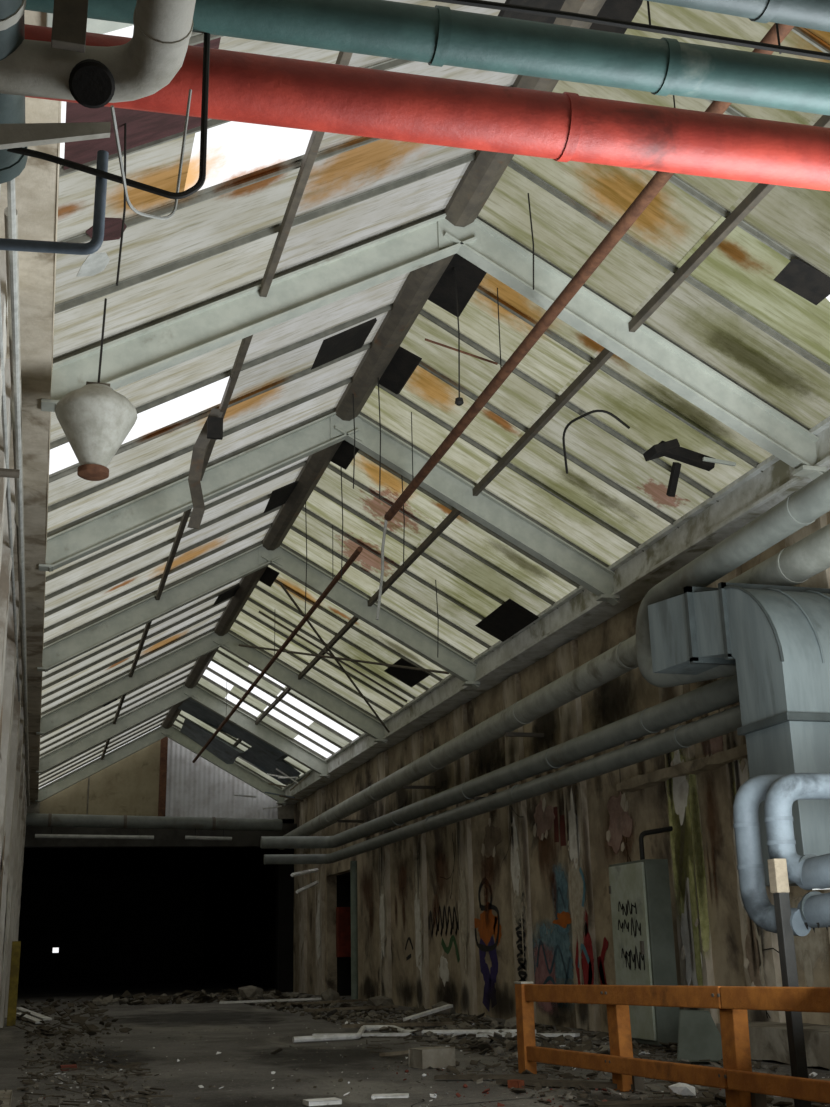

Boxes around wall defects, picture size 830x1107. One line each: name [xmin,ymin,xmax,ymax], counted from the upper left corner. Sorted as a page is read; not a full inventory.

damp [595,671,631,728]
damp [533,710,555,754]
damp [429,759,460,794]
damp [476,739,513,775]
damp [722,734,740,803]
damp [557,783,592,985]
damp [667,752,703,986]
damp [437,983,469,1015]
damp [549,1002,589,1031]